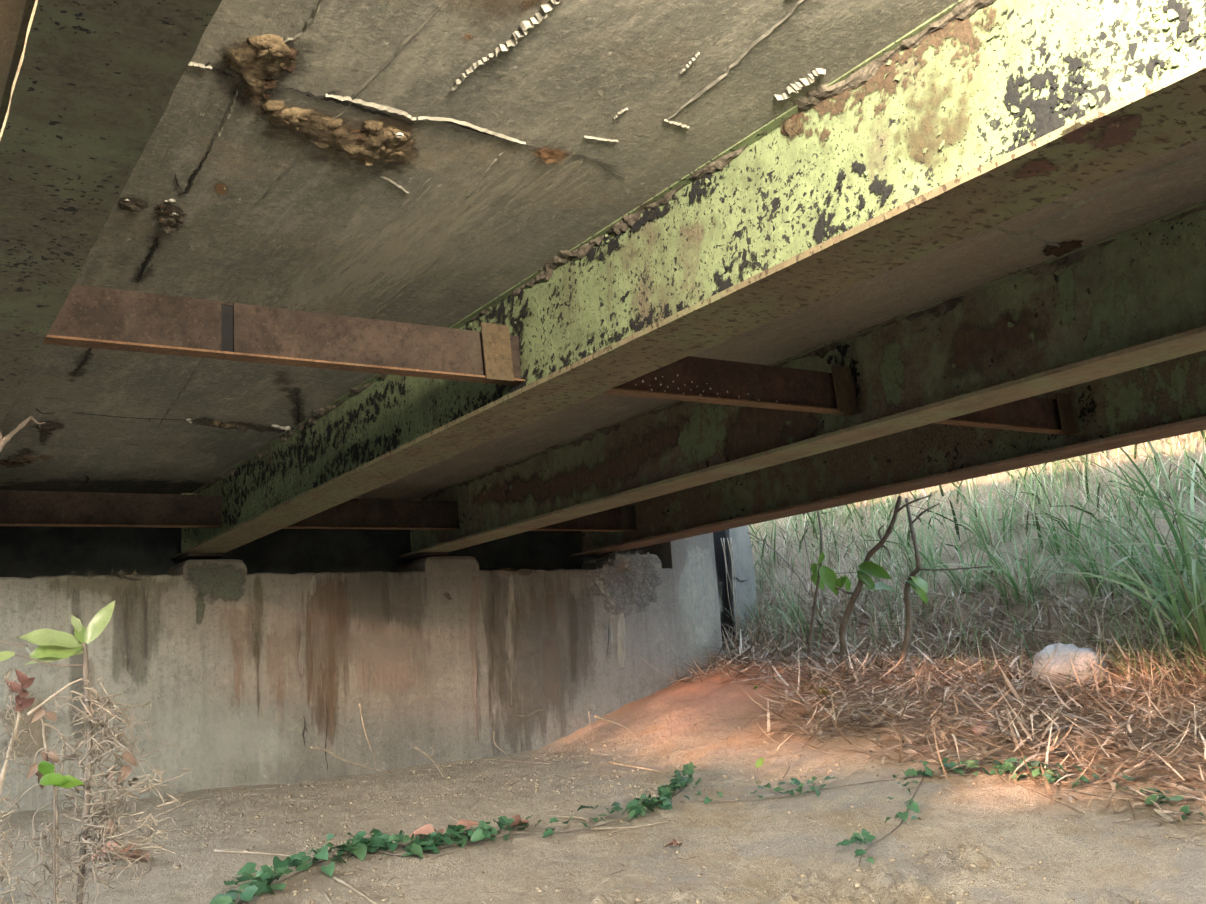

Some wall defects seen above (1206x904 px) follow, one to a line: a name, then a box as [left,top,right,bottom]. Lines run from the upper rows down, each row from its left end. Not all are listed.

crack [174,62,238,196]
crack [276,87,626,178]
peeling [998,52,1152,150]
crack [134,237,159,283]
spalling [119,198,185,235]
crack [35,408,187,421]
spalling [586,550,662,615]
leakage [252,577,262,709]